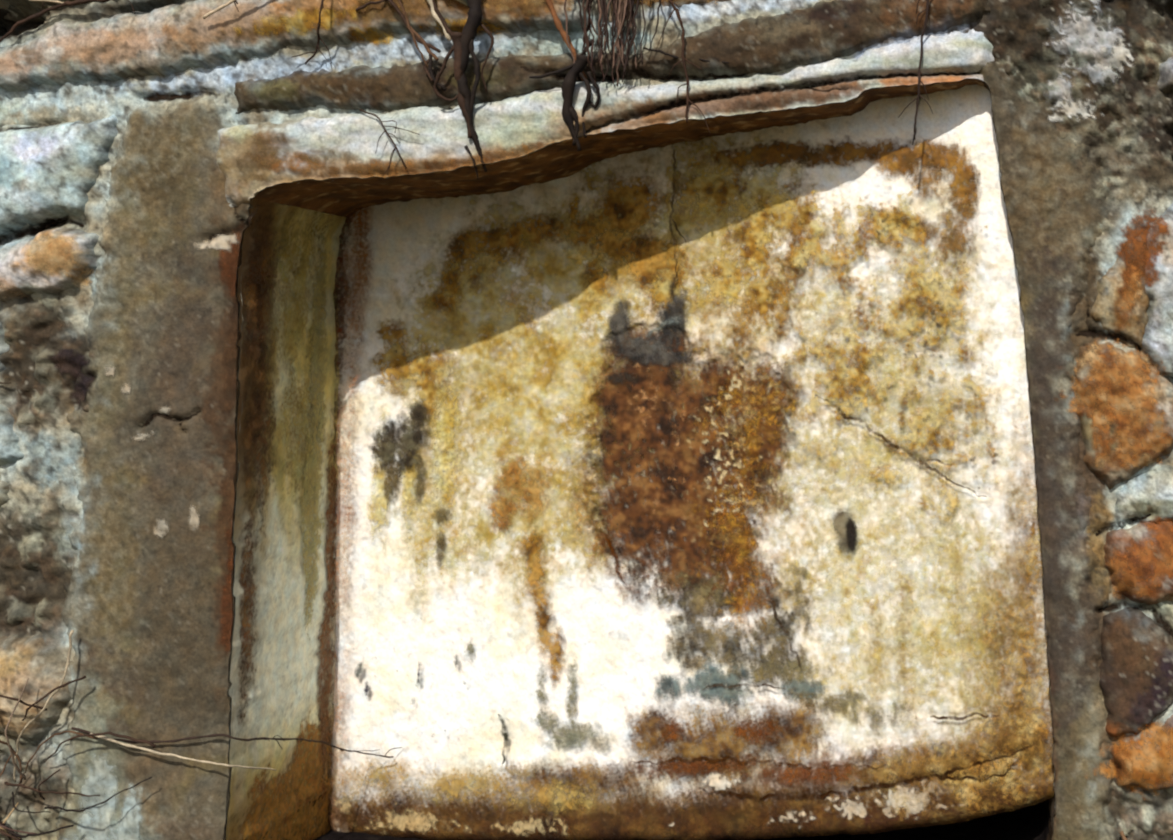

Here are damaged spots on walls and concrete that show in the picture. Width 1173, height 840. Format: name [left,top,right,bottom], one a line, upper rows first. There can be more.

crack [521,66,978,145]
crack [669,143,686,298]
leakage [371,137,1040,752]
crack [815,394,987,497]
leakage [355,663,370,695]
crack [632,745,1033,801]